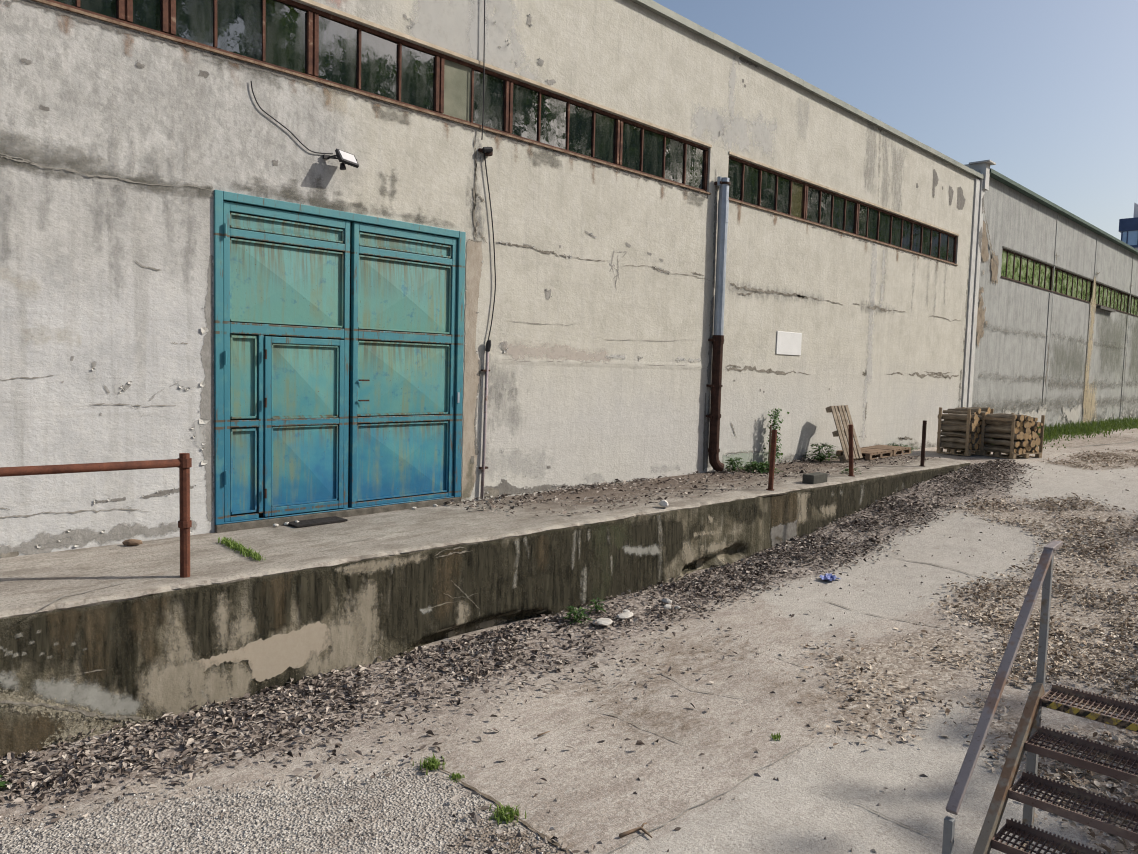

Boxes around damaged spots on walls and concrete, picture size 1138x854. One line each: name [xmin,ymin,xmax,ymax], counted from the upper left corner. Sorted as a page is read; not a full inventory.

crack [468,128,905,312]
flaking render [933,169,965,210]
flaking render [676,172,768,470]
damp [974,277,1137,422]
damp [0,712,64,761]
damp [0,585,236,701]
flaking render [0,554,426,748]
damp [250,667,308,695]
damp [254,571,333,640]
flaking render [448,602,507,638]
damp [346,515,727,647]